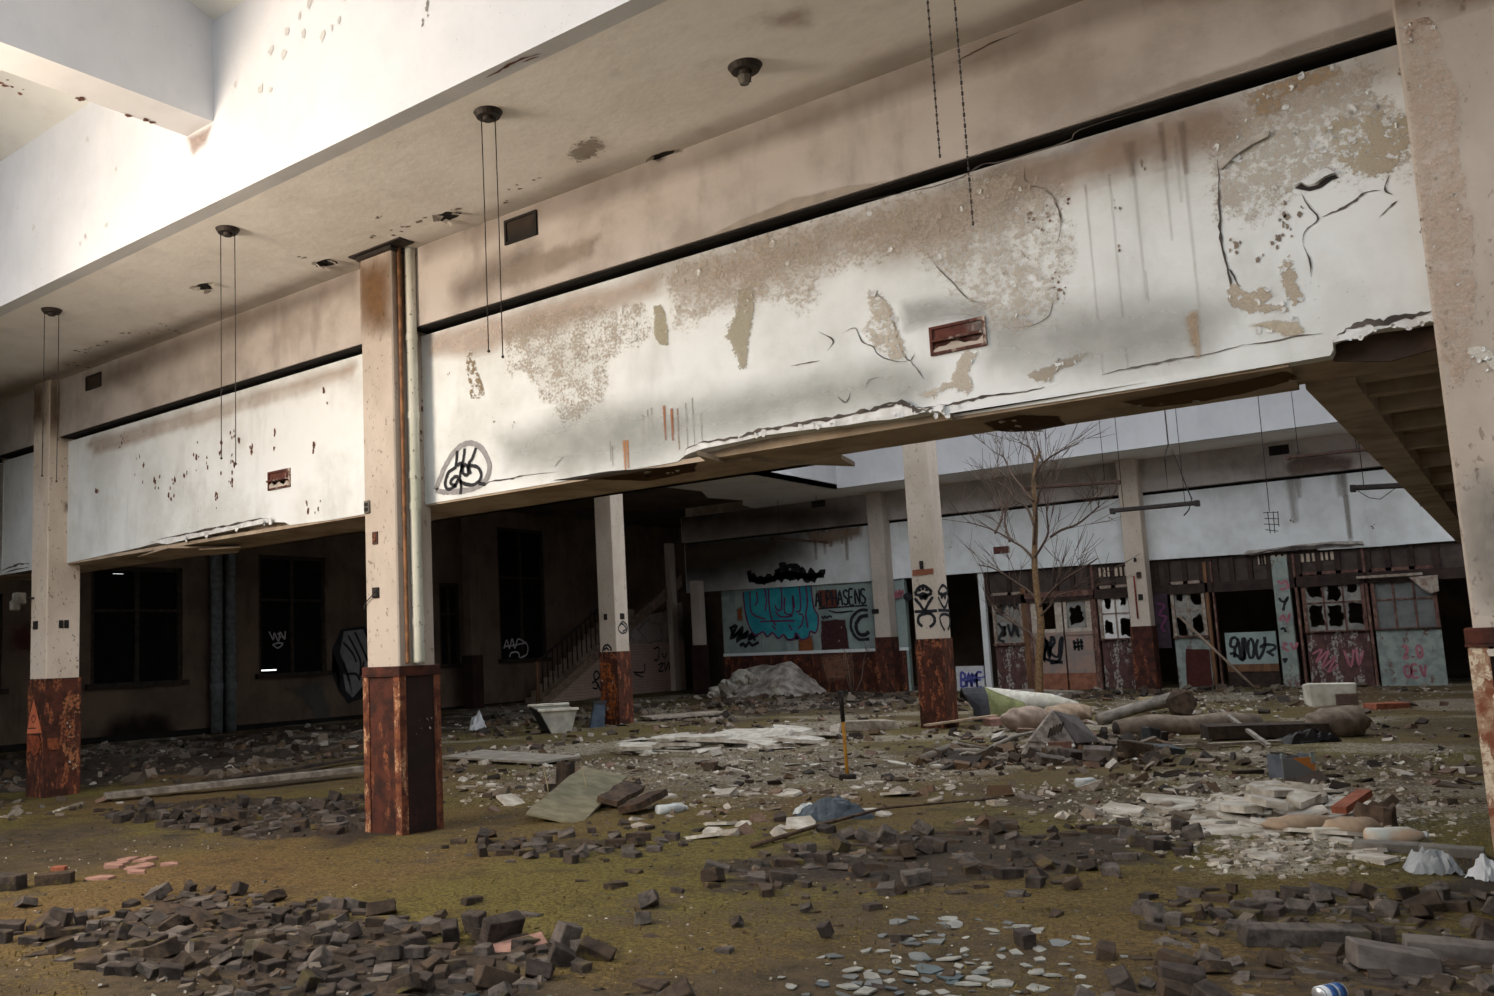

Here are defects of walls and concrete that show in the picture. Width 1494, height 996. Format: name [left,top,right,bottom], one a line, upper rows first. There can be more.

crack [954,31,1020,63]
crack [1217,161,1239,285]
peeling [1204,64,1412,336]
crack [1302,176,1397,272]
peeling [506,171,1073,481]
peeling [1028,353,1087,382]
rust [62,694,80,771]